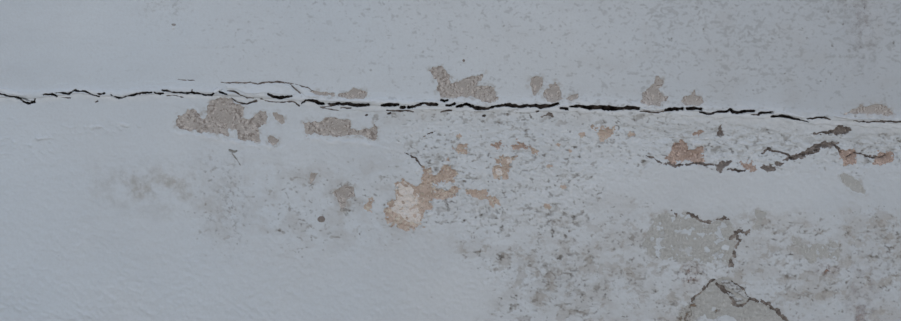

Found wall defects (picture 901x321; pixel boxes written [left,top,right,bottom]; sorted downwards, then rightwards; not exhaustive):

peeling [176,81,378,146]
crack [0,87,901,166]
peeling [428,66,499,103]
peeling [530,76,579,118]
peeling [640,76,668,106]
peeling [332,185,375,213]
spalling [383,133,501,231]
spalling [490,138,539,180]
crack [646,155,746,173]
spalling [665,104,894,194]
peeling [642,209,788,321]